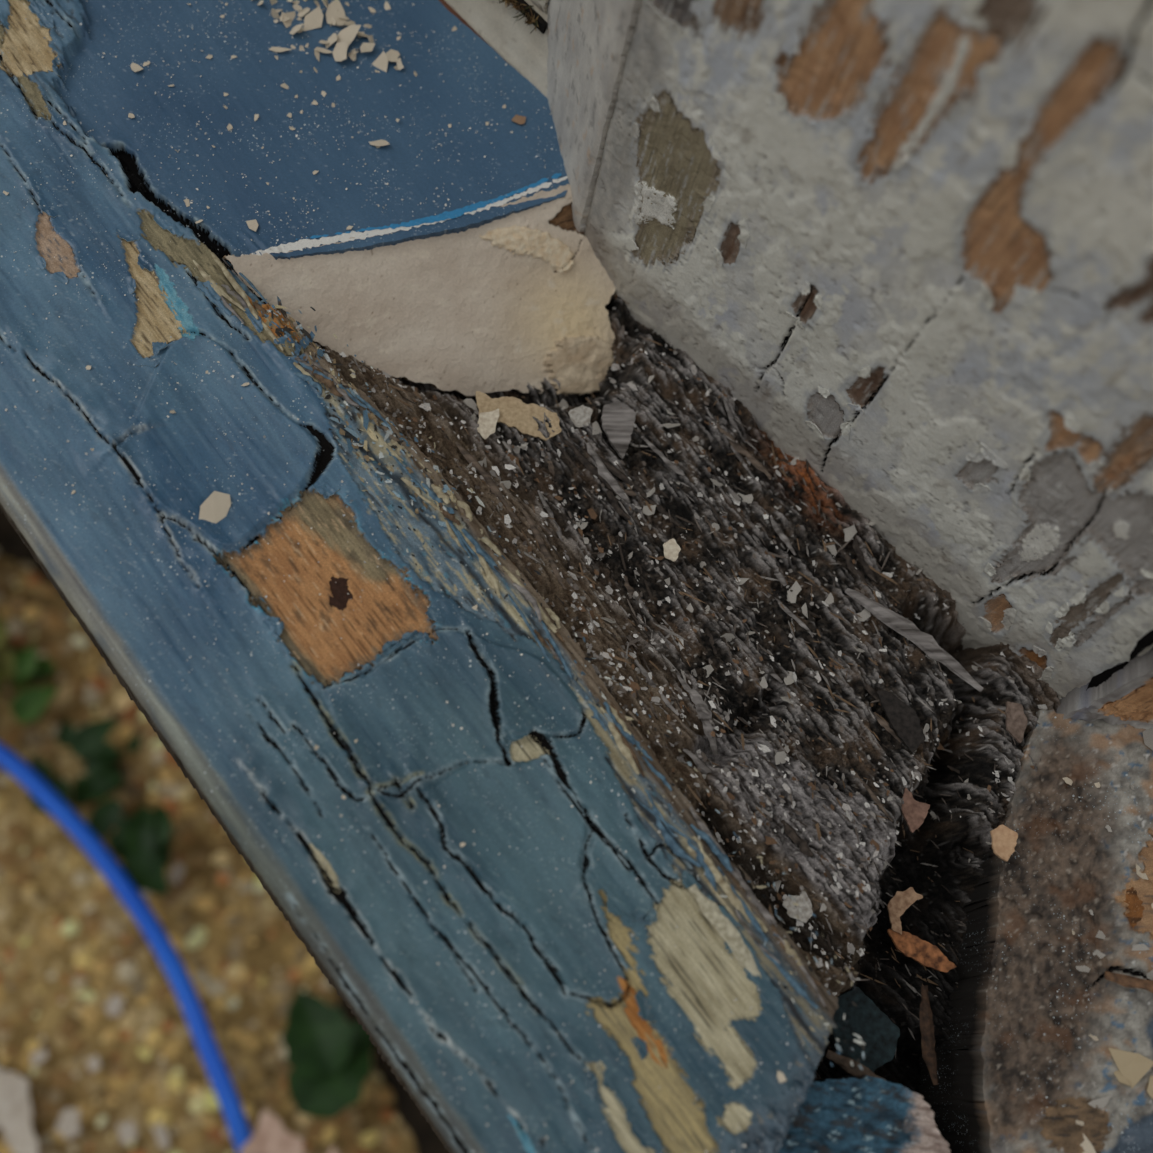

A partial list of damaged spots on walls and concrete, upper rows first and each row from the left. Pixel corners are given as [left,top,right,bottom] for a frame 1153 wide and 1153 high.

peeling [629,91,723,266]
peeling [771,0,1045,182]
peeling [961,38,1123,314]
peeling [116,209,315,367]
peeling [213,482,444,687]
peeling [787,581,808,618]
peeling [956,411,1153,683]
crack [260,629,689,1077]
peeling [985,825,1018,862]
crack [331,962,468,1153]
peeling [584,870,774,1153]
peeling [1040,1097,1112,1153]